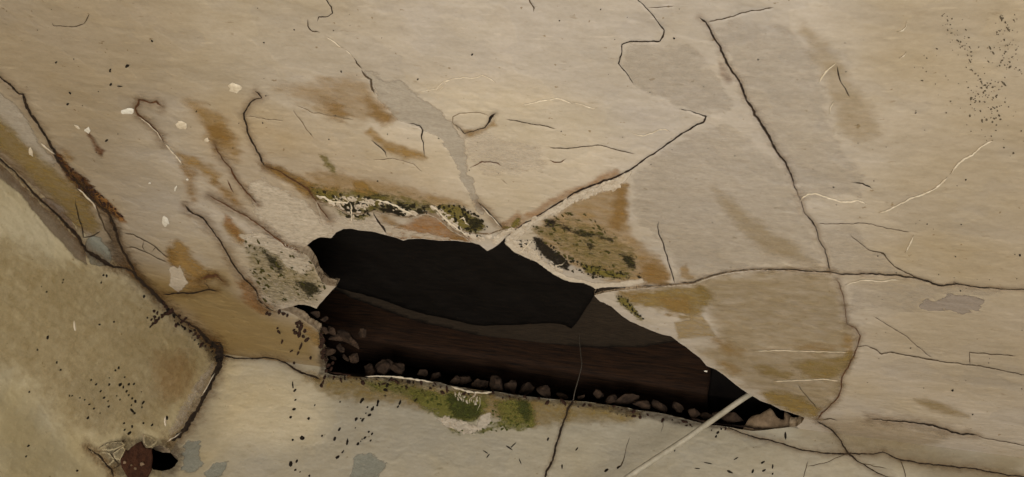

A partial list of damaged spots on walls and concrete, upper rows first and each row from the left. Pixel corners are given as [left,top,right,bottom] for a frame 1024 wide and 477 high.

crack [618,0,672,83]
damp [942,13,1022,154]
corrosion [56,152,123,218]
crack [0,77,319,445]
damp [268,167,465,240]
damp [368,129,424,157]
crack [452,109,707,235]
crack [647,7,1024,477]
peeling [919,294,984,314]
flaking render [91,372,227,477]
peeling [437,386,492,434]
damp [312,375,638,459]